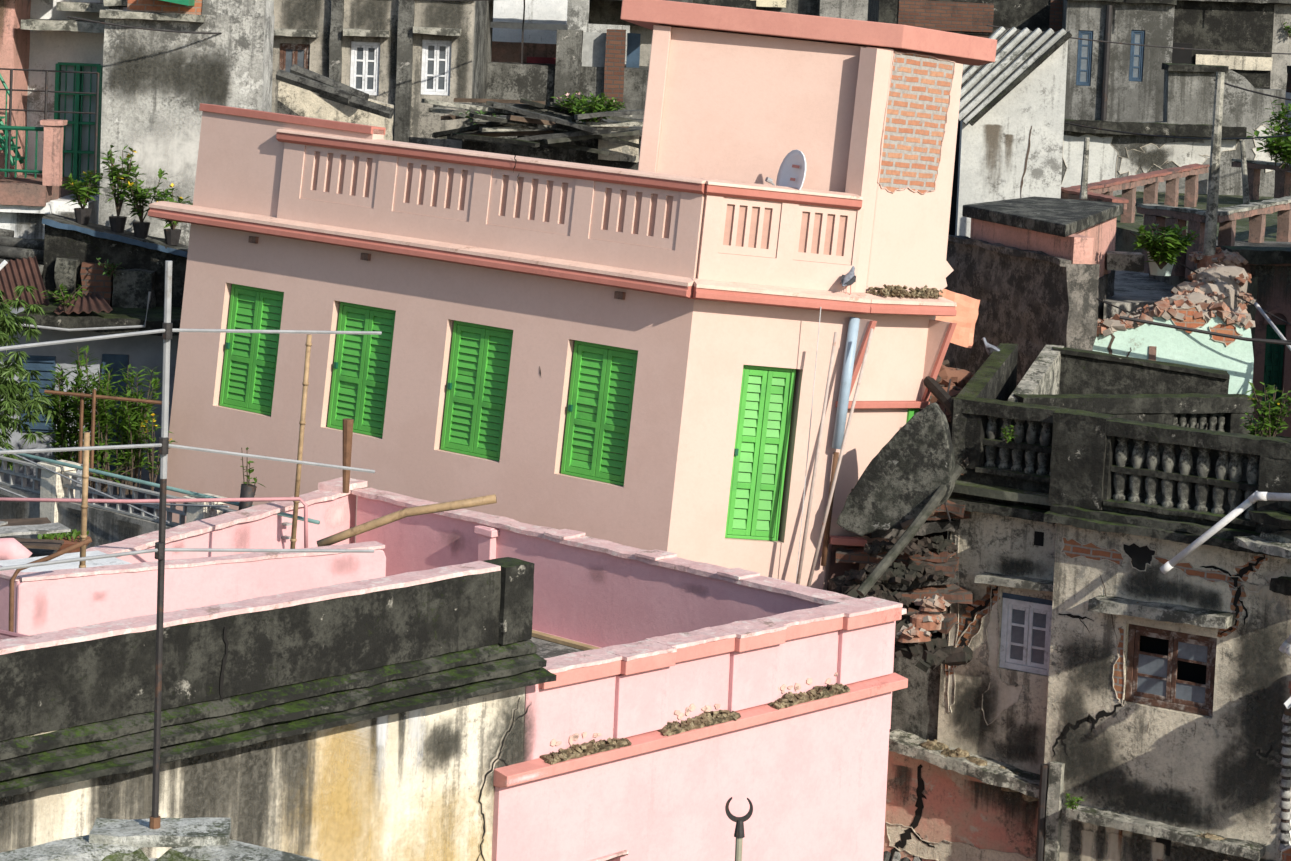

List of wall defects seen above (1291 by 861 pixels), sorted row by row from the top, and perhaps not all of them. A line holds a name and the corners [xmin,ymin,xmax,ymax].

flaking render [877,52,955,194]
flaking render [1060,536,1291,593]
crack [1201,555,1268,638]
flaking render [947,585,1023,725]
damp [953,673,1039,761]
crack [1050,699,1149,758]
flaking render [1112,626,1125,706]
damp [1055,582,1287,828]
damp [90,708,459,861]
crack [476,697,530,861]
crack [891,764,935,861]
damp [1069,821,1273,861]